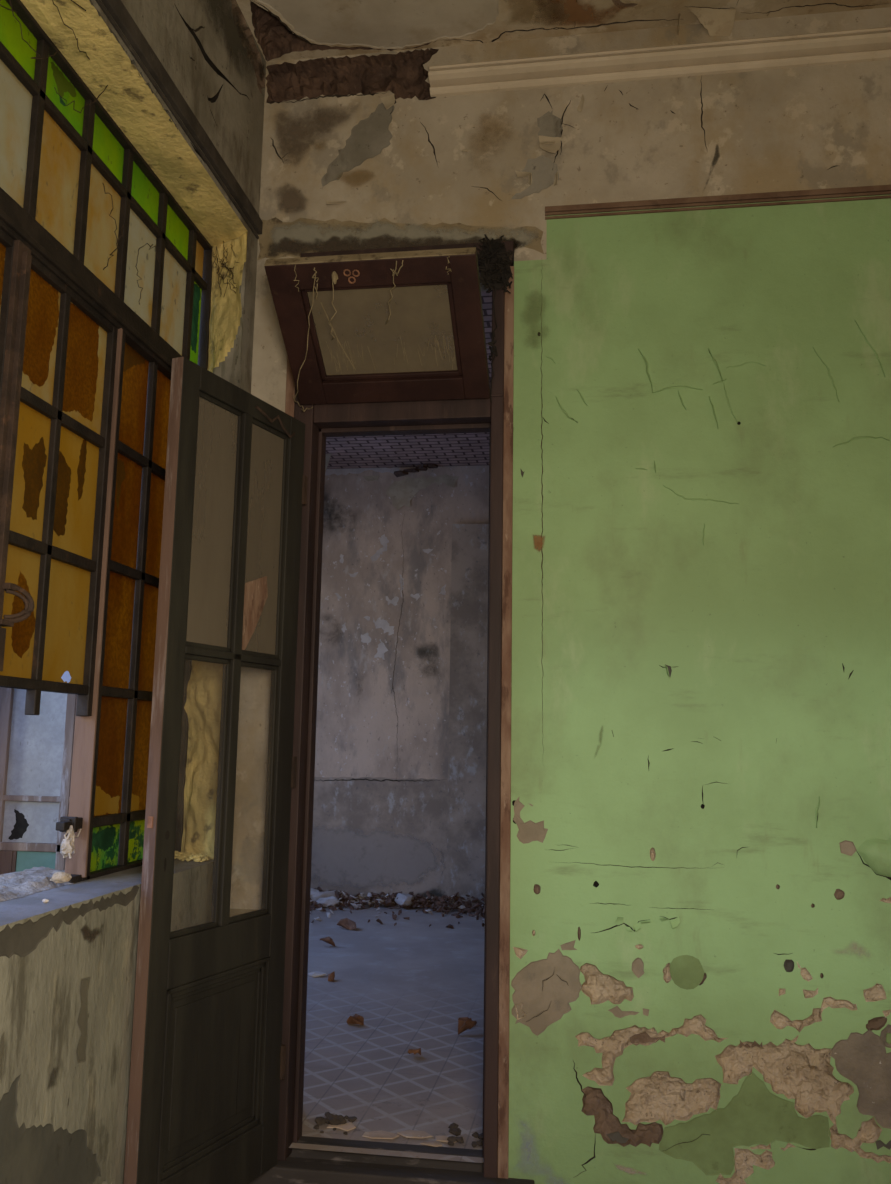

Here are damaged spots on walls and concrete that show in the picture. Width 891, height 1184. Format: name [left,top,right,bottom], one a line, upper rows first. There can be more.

crack [453,0,678,43]
crack [755,3,880,13]
crack [174,3,396,123]
flaking render [231,0,438,94]
leakage [278,109,347,156]
crack [420,122,438,165]
peeling [472,93,585,201]
leakage [280,188,305,212]
peeling [512,797,548,844]
spalling [0,866,74,902]
peeling [0,885,139,958]
peeling [511,916,891,1184]